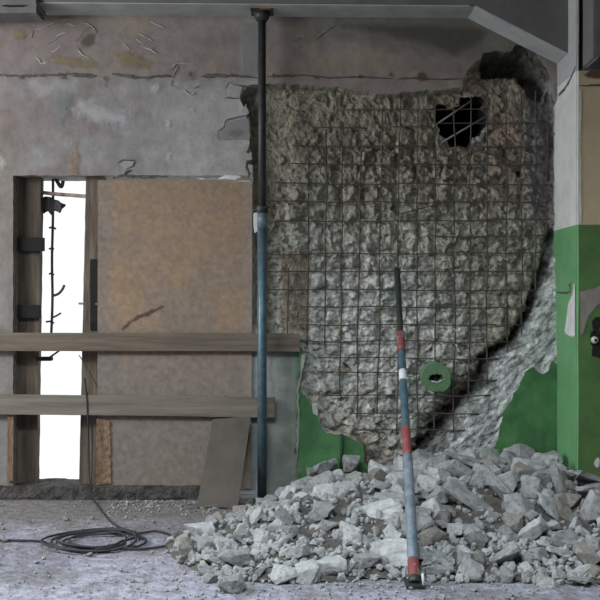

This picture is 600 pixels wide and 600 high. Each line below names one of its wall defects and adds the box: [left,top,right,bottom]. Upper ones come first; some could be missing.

crack [0,71,96,79]
crack [112,72,171,80]
crack [201,72,462,81]
flaking render [113,159,168,179]
spalling [217,82,258,327]
spalling [266,44,557,469]
peeling [564,284,600,337]